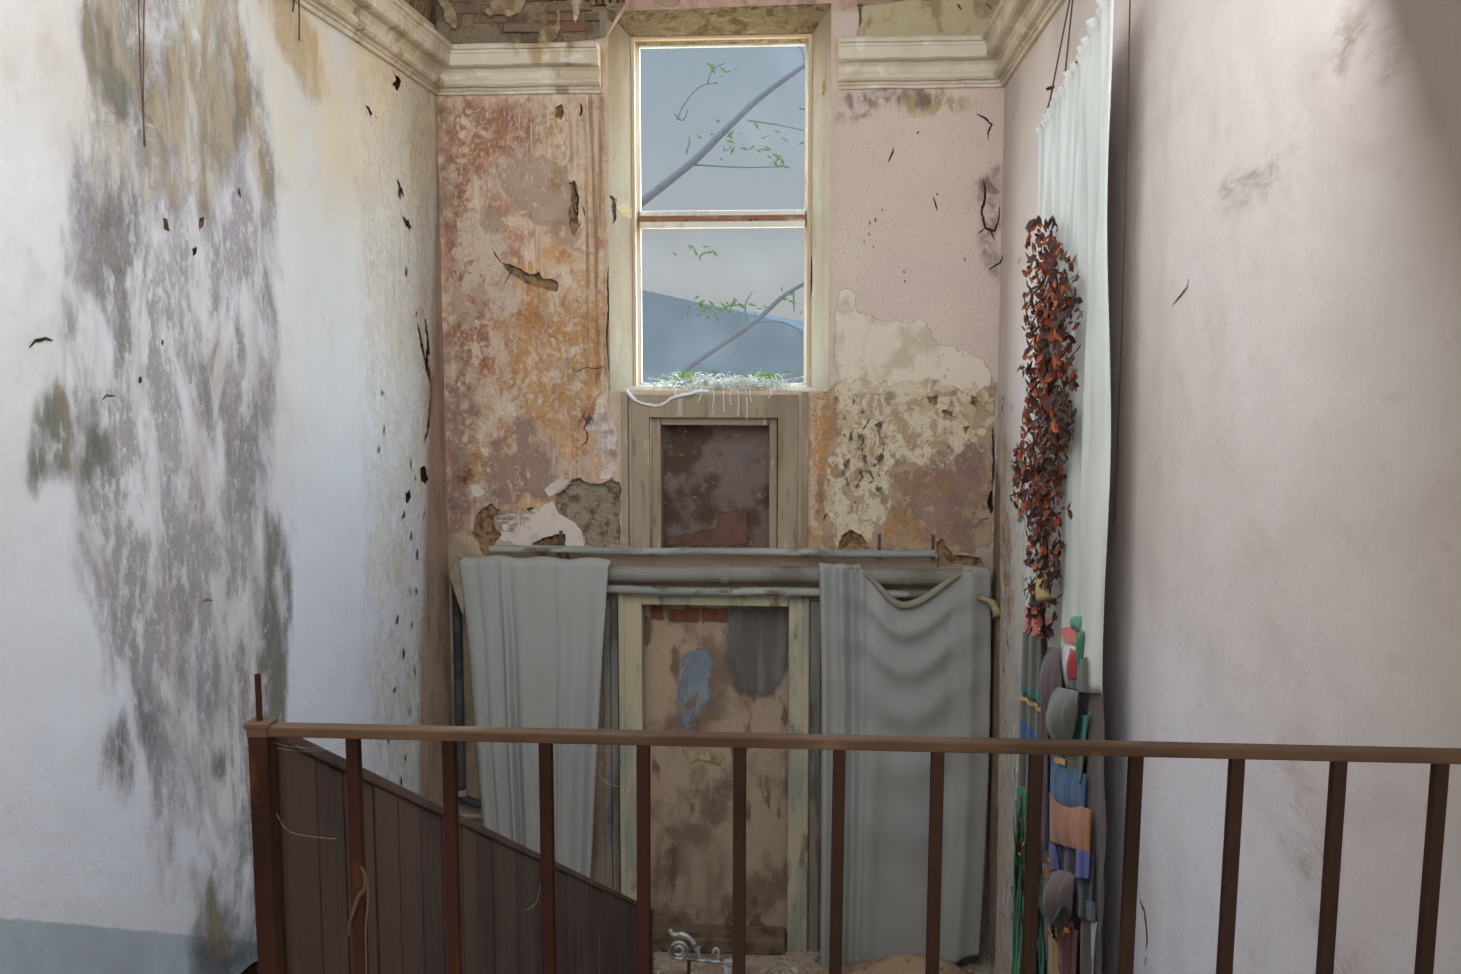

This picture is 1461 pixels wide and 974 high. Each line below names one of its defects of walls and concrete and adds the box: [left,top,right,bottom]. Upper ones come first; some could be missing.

flaking render [405,0,625,44]
flaking render [856,0,1001,37]
crack [977,114,993,140]
peeling [451,155,579,332]
crack [978,179,1020,270]
leakage [30,0,290,974]
flaking render [470,413,622,559]
peeling [833,288,993,568]